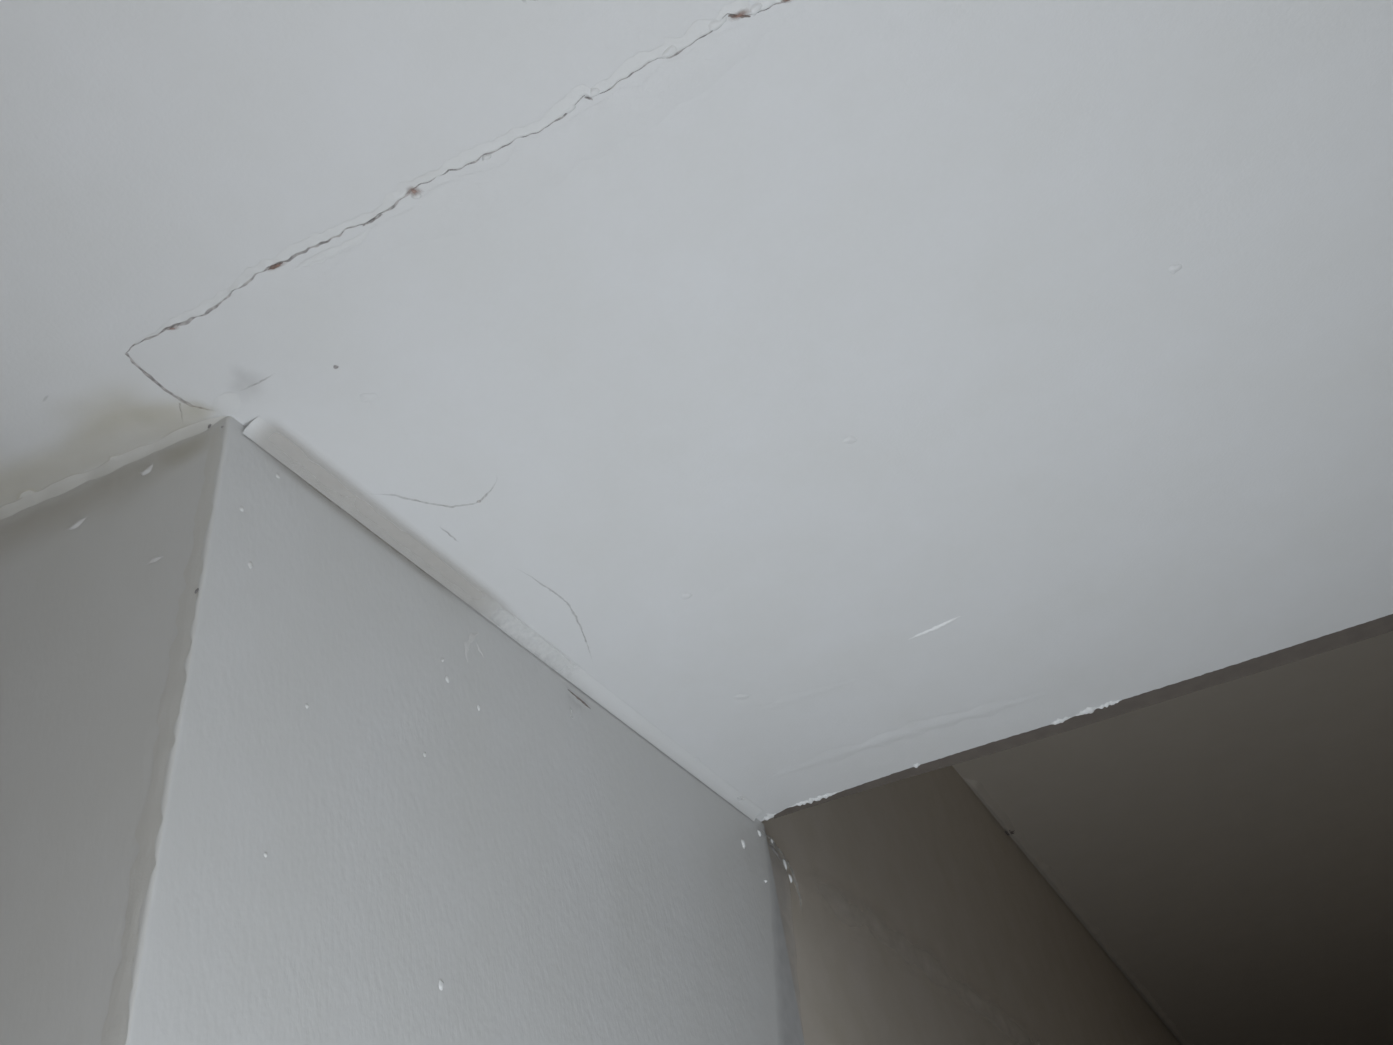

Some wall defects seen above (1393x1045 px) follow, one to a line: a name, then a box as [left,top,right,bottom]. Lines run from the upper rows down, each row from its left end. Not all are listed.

crack [0,0,794,520]